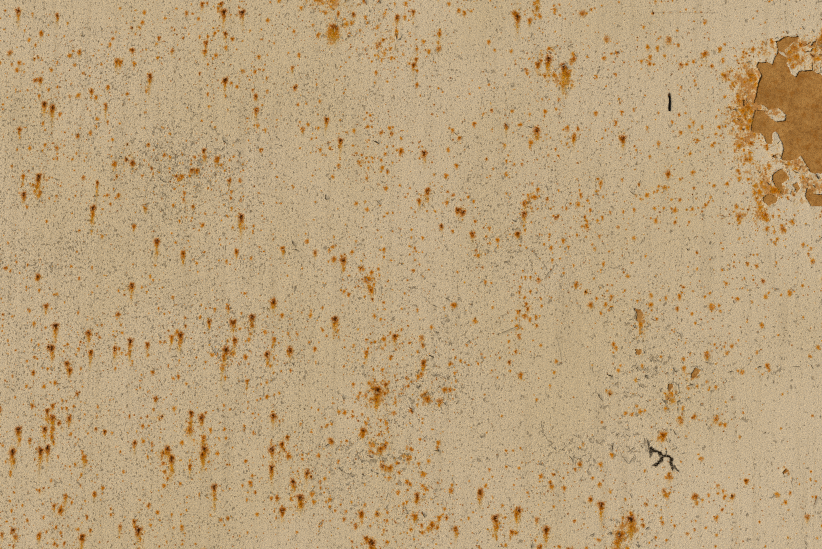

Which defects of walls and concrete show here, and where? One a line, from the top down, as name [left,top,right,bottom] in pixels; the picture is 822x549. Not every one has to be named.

peeling [741,34,822,206]
rust [787,5,822,69]
peeling [622,308,644,322]
crack [597,303,708,472]